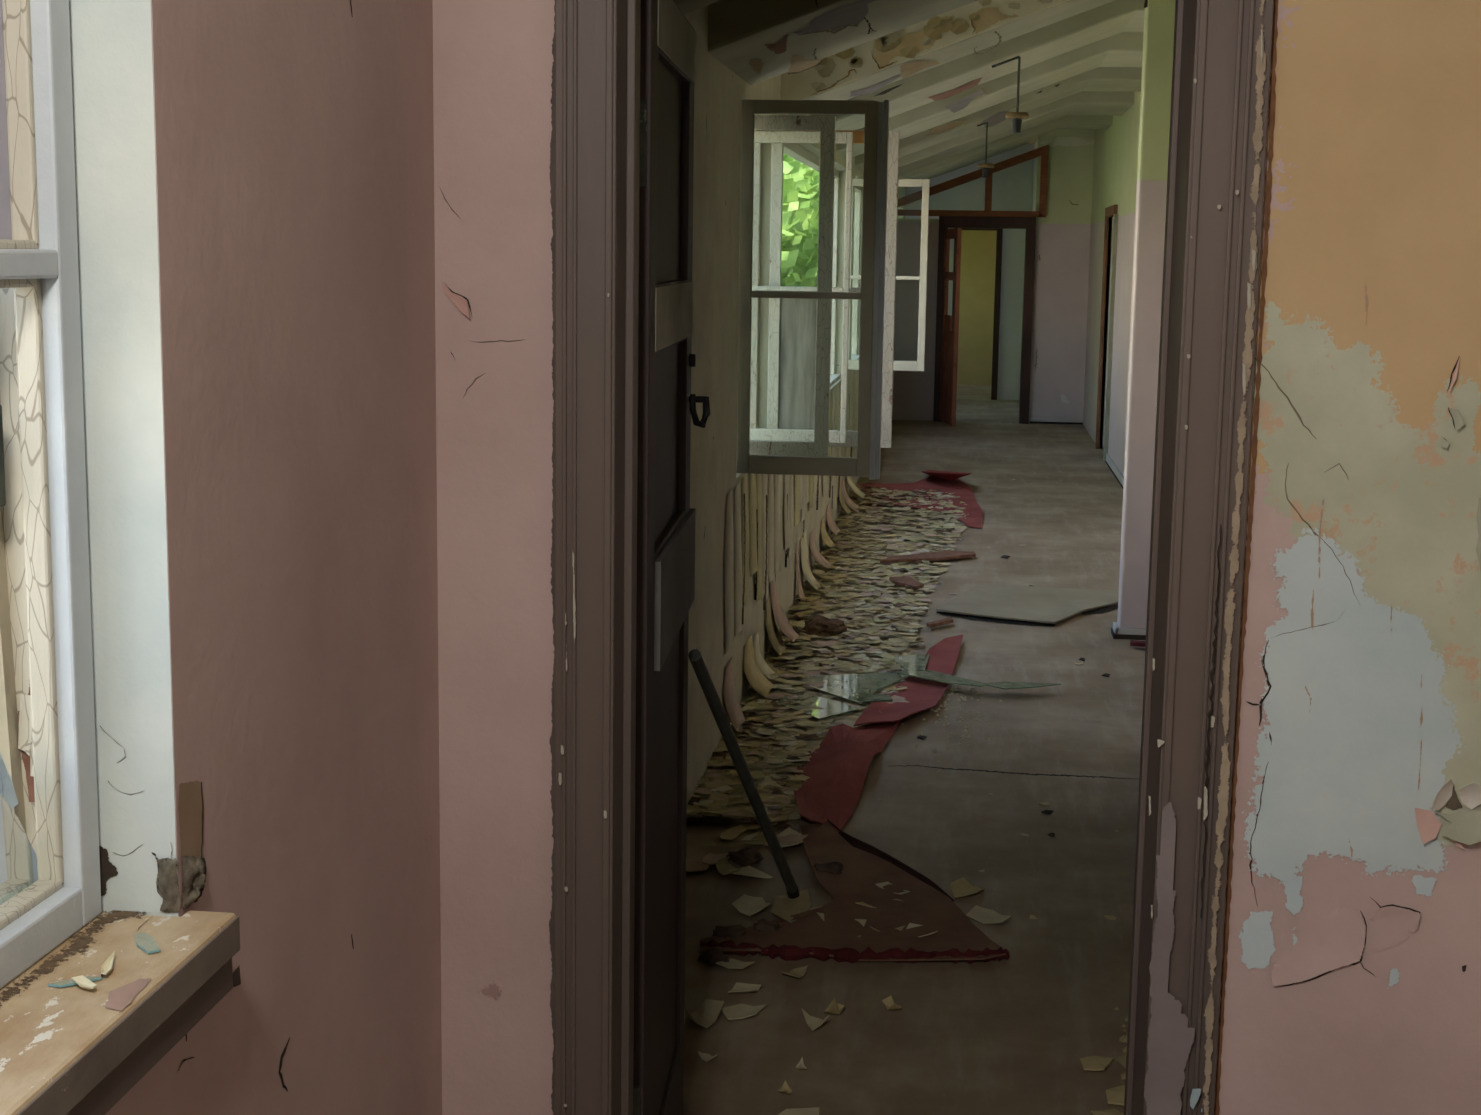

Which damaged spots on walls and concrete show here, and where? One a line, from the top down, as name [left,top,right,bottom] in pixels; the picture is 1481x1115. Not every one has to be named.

peeling [658,0,696,84]
peeling [749,0,877,75]
peeling [811,0,1020,97]
flaking render [927,77,1009,136]
crack [1255,358,1348,478]
peeling [1144,0,1481,1115]
crack [1200,463,1356,918]
flaking render [152,847,207,913]
peeling [71,950,151,1011]